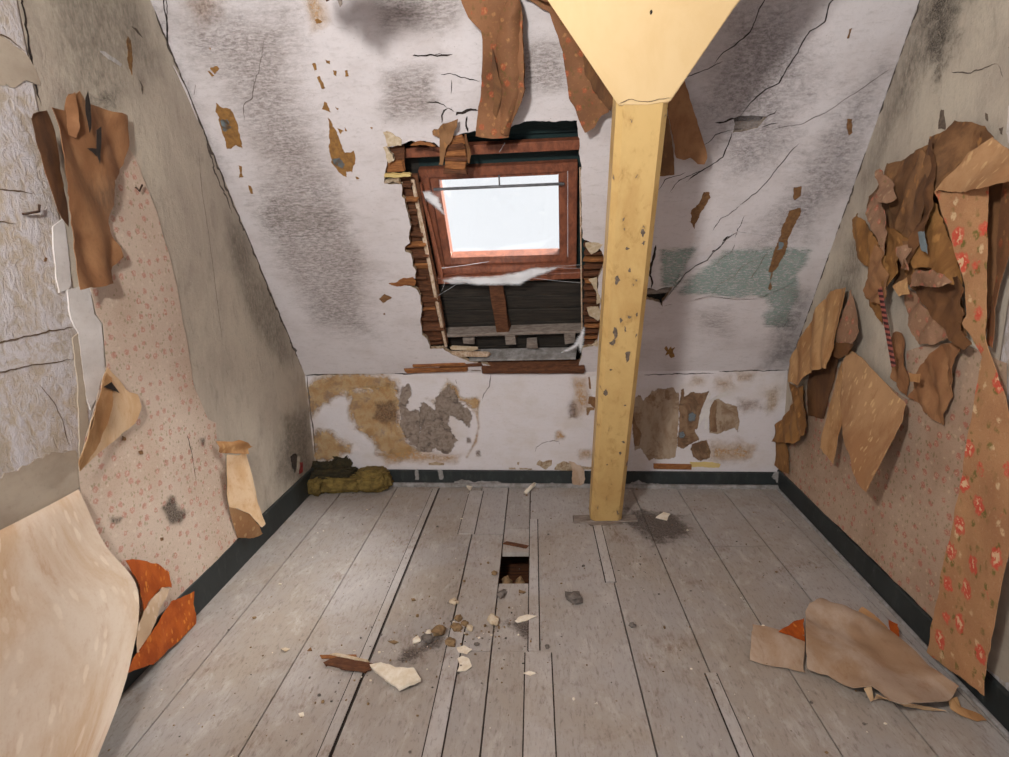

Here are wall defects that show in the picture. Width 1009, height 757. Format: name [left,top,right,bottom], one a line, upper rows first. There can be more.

leakage [222,33,312,200]
crack [649,0,920,305]
peeling [768,186,802,290]
crack [795,154,865,349]
flaking render [0,219,105,530]
flaking render [399,384,501,490]
flaking render [619,387,740,468]